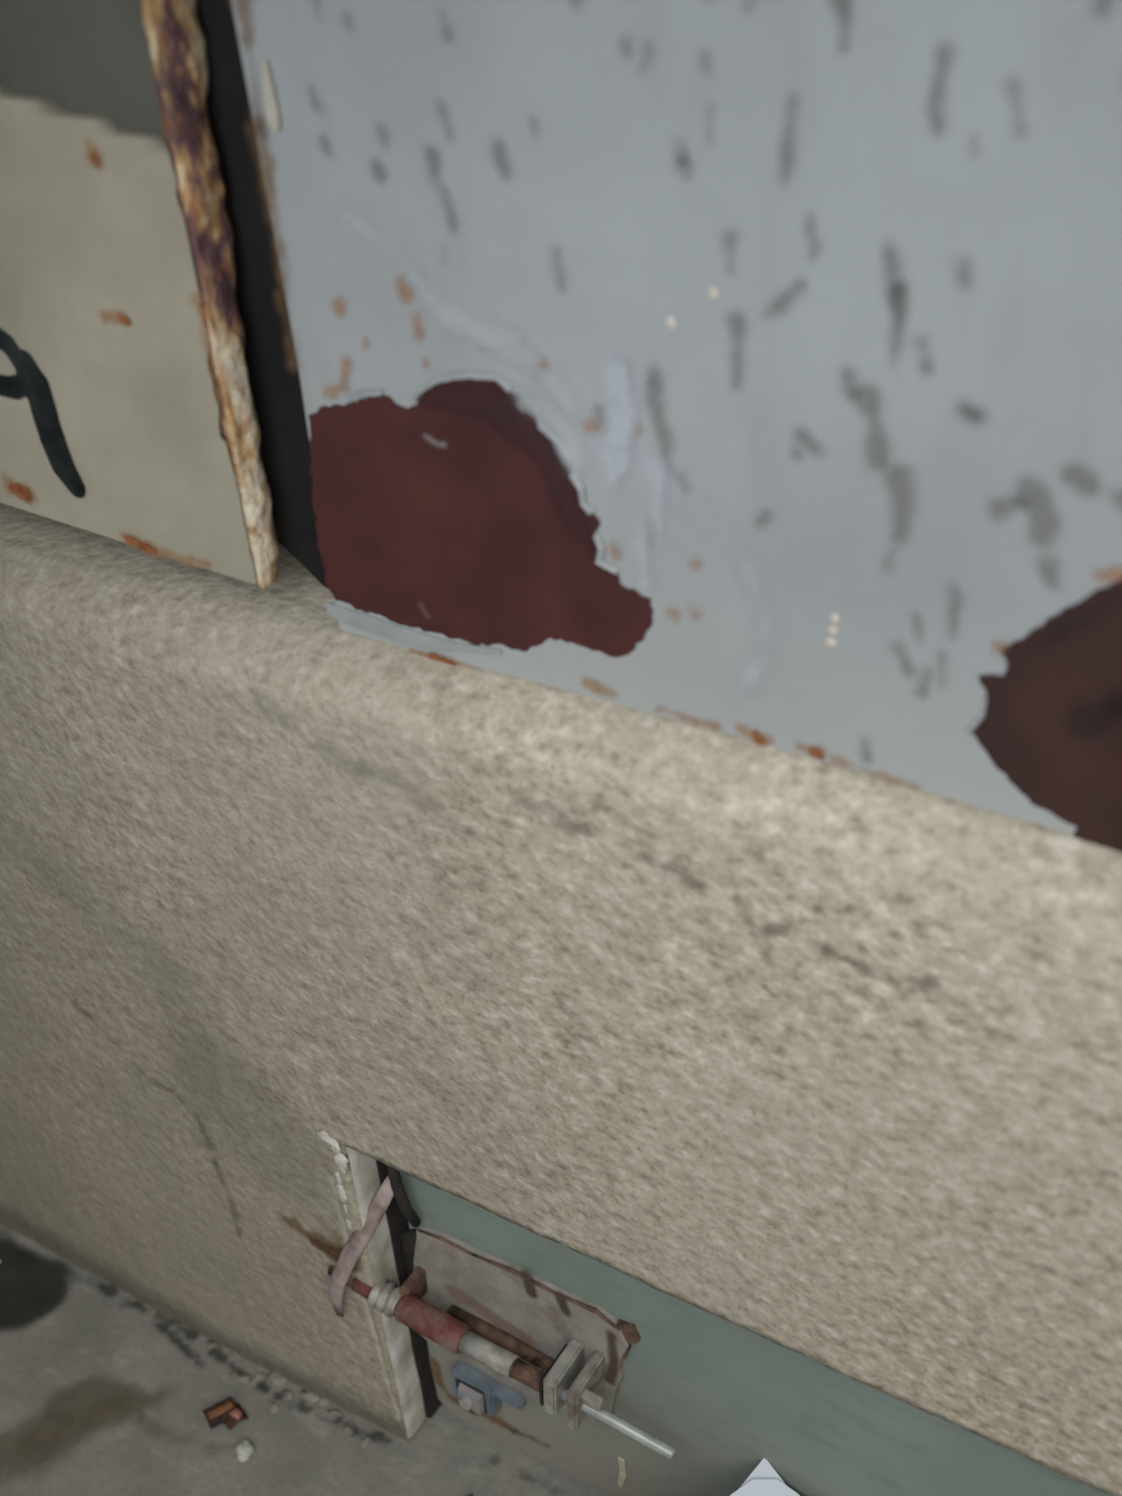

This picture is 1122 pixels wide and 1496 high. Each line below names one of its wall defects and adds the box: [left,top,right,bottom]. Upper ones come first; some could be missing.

rust [140,0,279,589]
leakage [603,359,632,480]
rust [125,536,169,554]
peeling [308,370,653,657]
peeling [965,577,1122,852]
leakage [0,1239,66,1330]
rust [284,1219,358,1270]